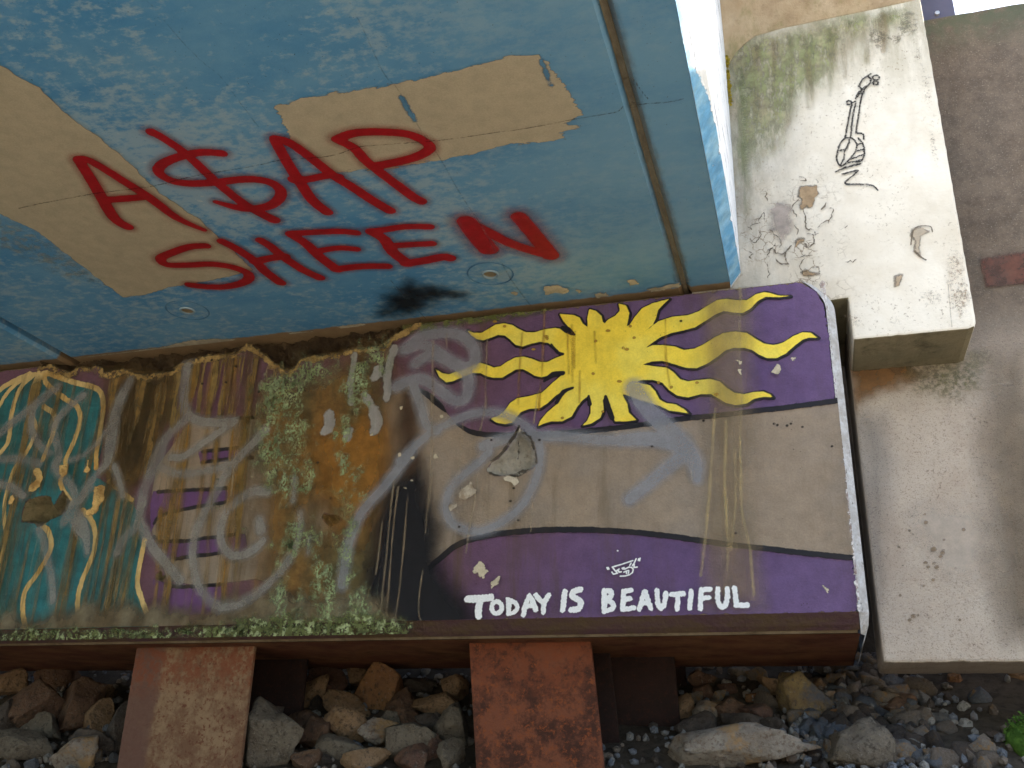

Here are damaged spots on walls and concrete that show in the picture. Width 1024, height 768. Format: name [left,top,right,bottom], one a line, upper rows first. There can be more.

crack [748,176,847,278]
peeling [910,225,933,260]
peeling [628,279,681,293]
spalling [37,318,422,381]
rust [155,354,388,616]
spalling [487,425,541,502]